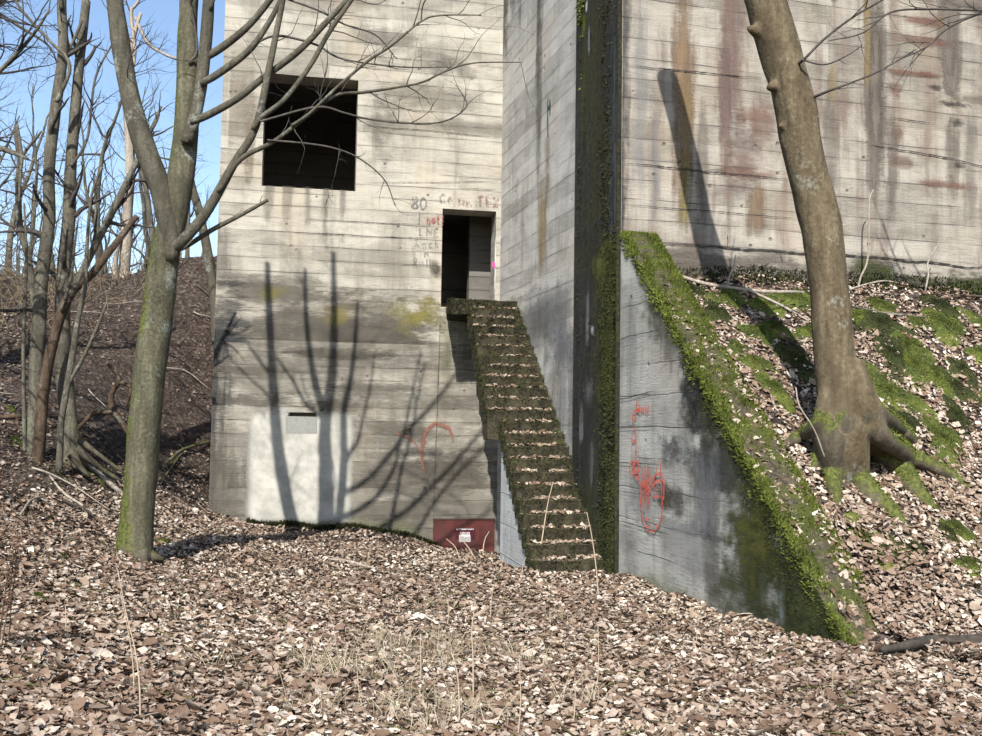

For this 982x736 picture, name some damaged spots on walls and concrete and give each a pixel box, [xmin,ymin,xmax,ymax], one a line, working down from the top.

rust [908,17,939,25]
rust [671,2,695,221]
rust [720,0,773,232]
leakage [211,275,429,437]
leakage [209,455,245,488]
leakage [365,453,487,504]
leakage [659,485,683,515]
leakage [664,438,680,461]
leakage [680,372,735,541]